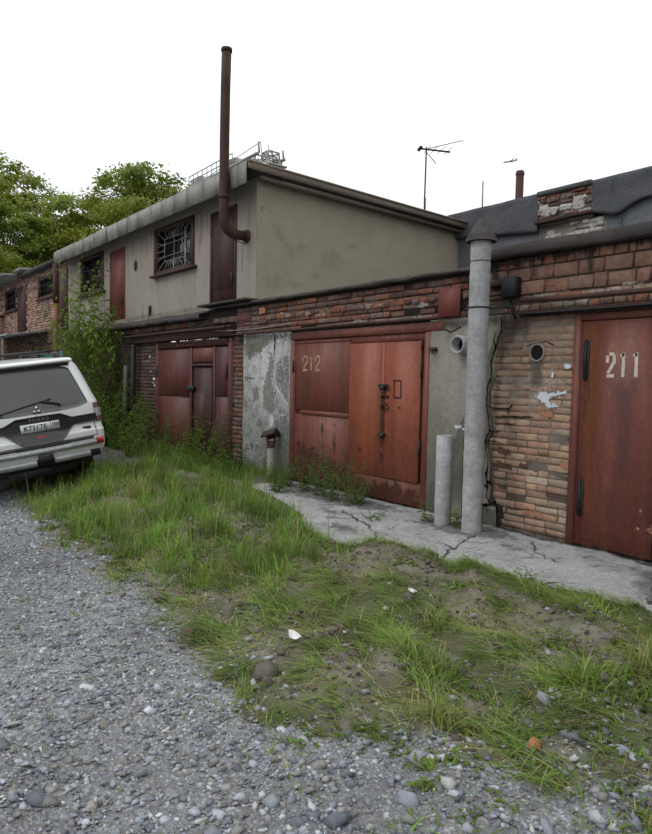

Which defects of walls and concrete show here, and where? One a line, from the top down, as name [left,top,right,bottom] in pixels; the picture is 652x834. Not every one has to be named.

peeling [563,193,585,211]
water stain [244,332,291,360]
peeling [535,388,567,418]
crack [428,316,533,556]
rust [294,439,420,509]
crack [321,510,400,537]
water stain [494,525,652,566]
crack [512,541,581,593]